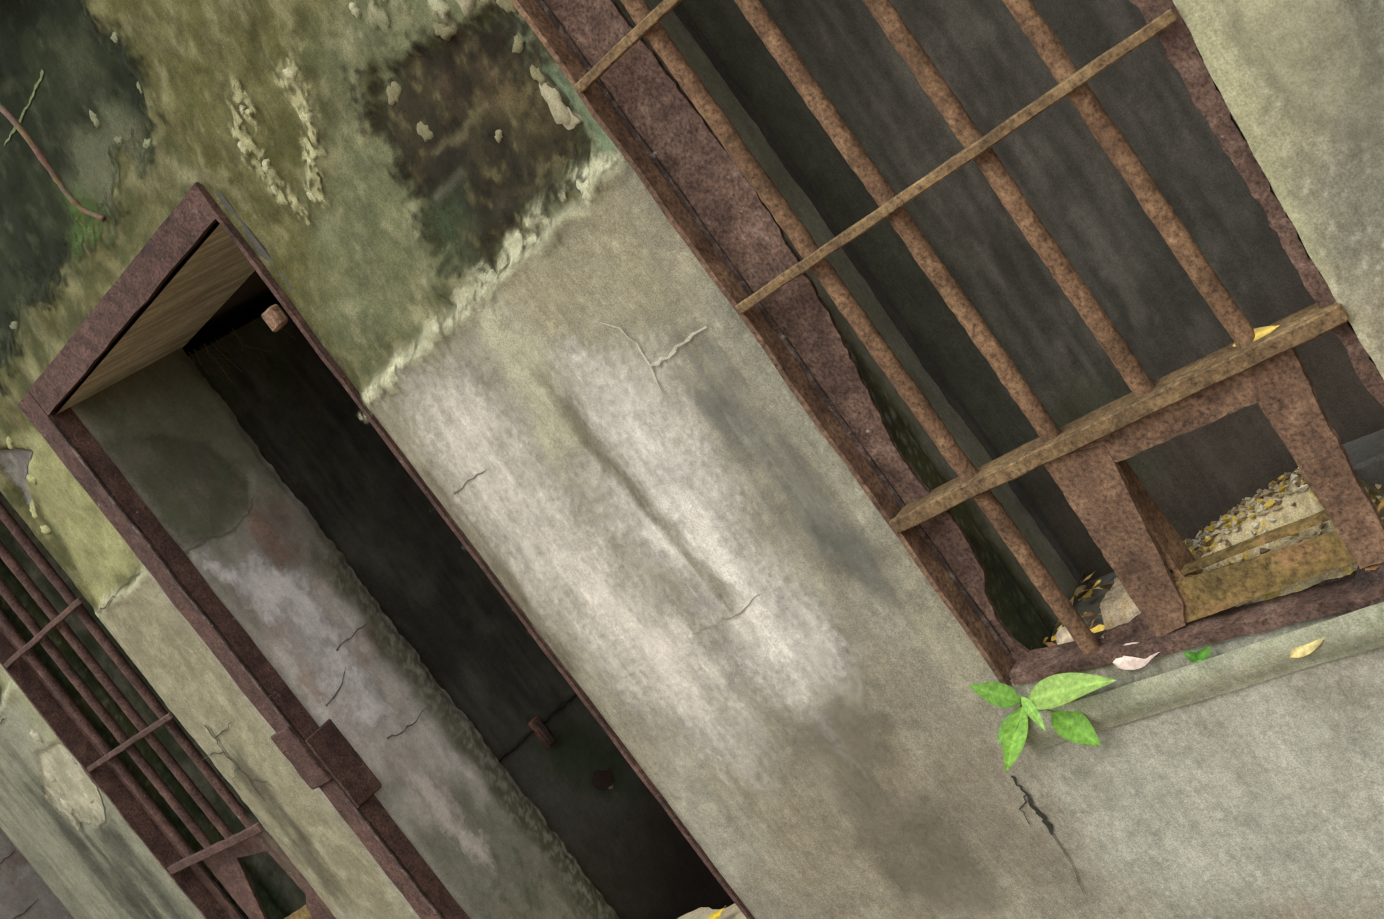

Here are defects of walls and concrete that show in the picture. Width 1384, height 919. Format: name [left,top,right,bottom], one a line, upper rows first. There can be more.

leakage [4,69,44,145]
peeling [228,59,327,225]
spalling [0,436,52,535]
crack [1011,775,1085,896]